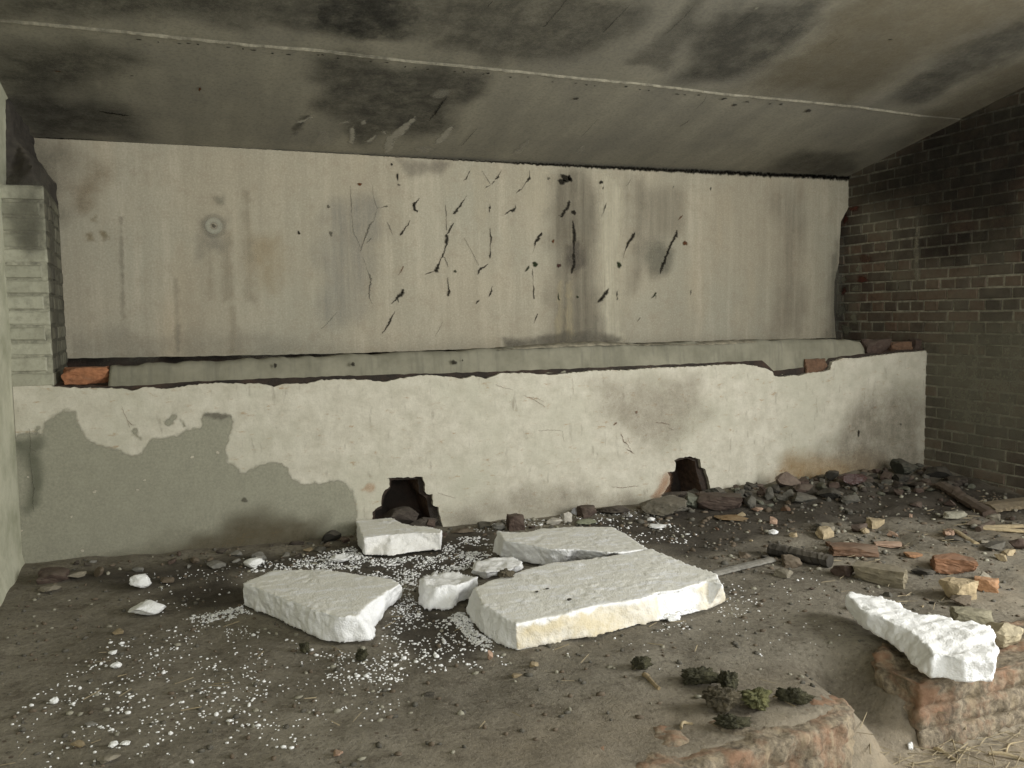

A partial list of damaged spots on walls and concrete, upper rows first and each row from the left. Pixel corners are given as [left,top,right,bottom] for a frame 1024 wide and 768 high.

damp [343,118,415,154]
crack [350,170,530,333]
crack [532,201,576,323]
damp [506,175,620,346]
crack [637,215,683,322]
peeling [15,411,357,563]